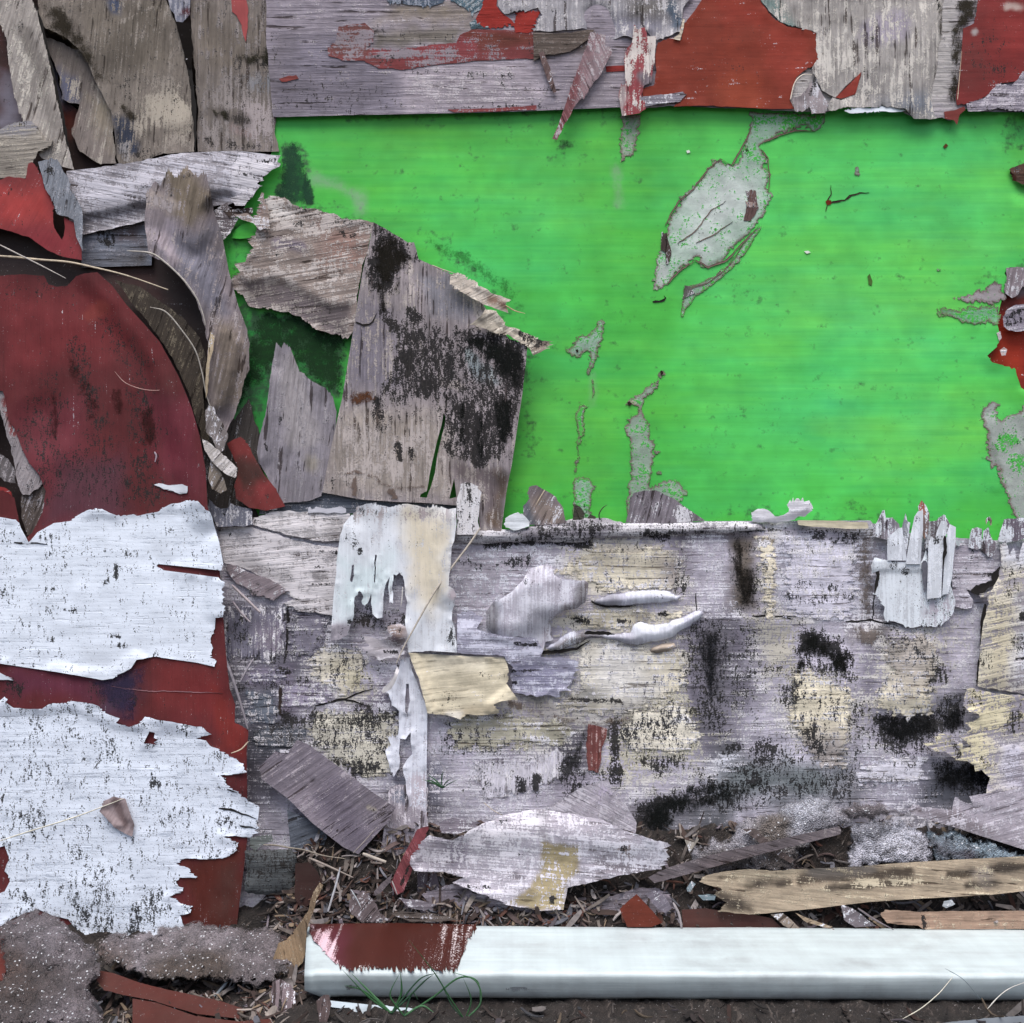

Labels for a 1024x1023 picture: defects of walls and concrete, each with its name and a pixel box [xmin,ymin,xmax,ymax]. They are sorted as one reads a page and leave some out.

peeling [327,0,540,70]
peeling [652,76,828,317]
water stain [374,236,413,311]
peeling [937,267,1024,356]
water stain [458,333,524,386]
water stain [495,399,512,444]
peeling [566,319,605,518]
peeling [624,371,688,515]
peeling [980,401,1024,518]
water stain [790,632,850,697]
water stain [876,708,965,742]
water stain [643,782,754,830]